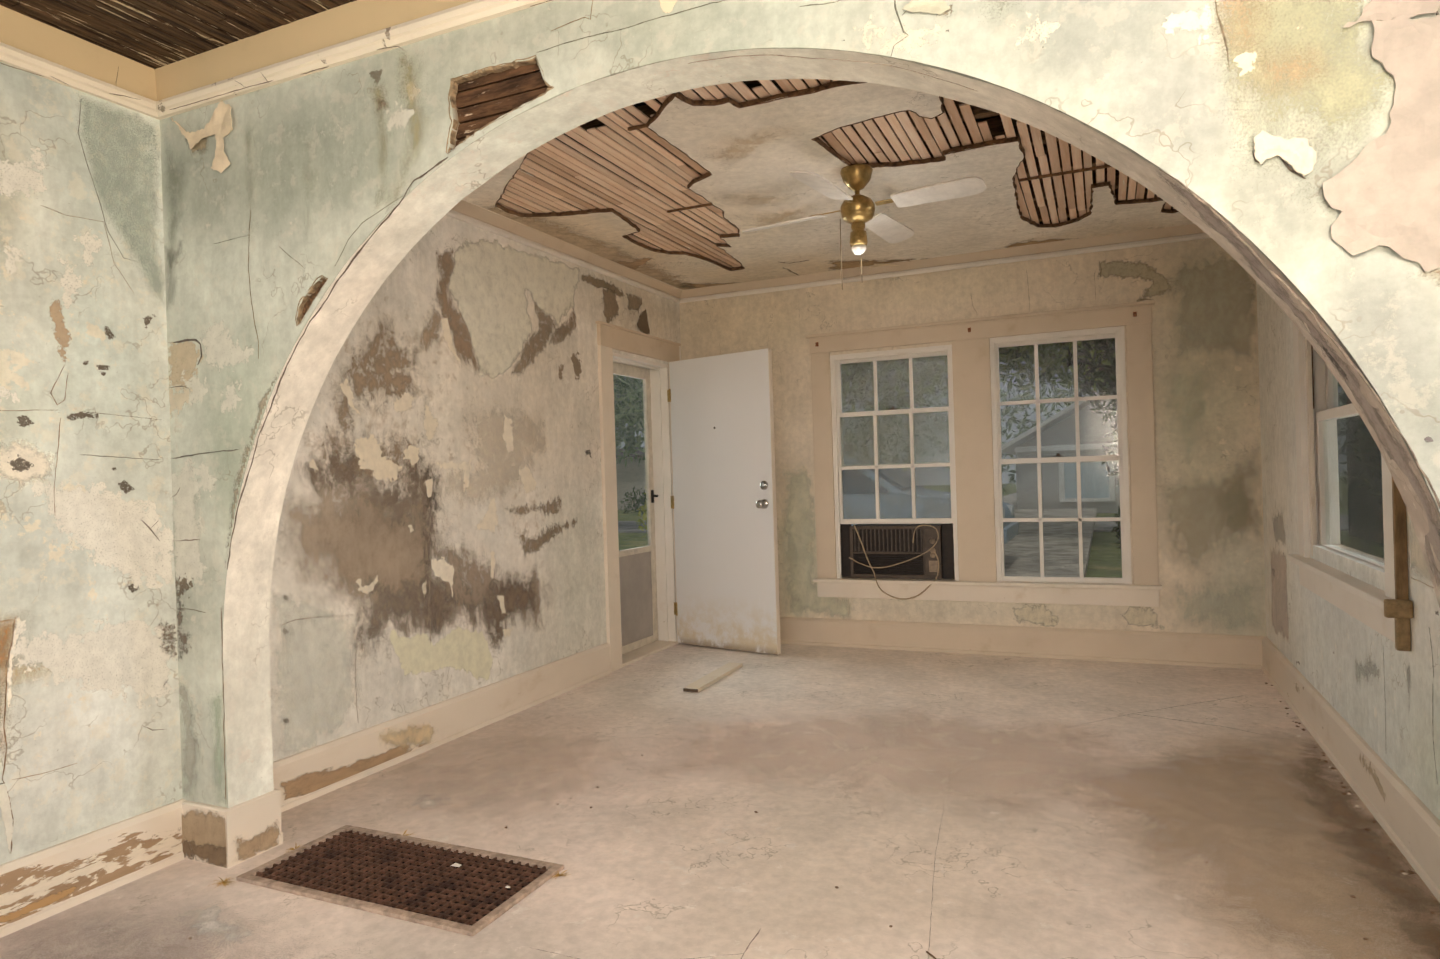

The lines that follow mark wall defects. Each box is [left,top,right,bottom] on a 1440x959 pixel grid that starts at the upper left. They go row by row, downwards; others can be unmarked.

peeling [171,101,233,173]
spalling [446,55,554,154]
peeling [659,0,677,14]
spalling [495,80,866,271]
peeling [1233,51,1257,77]
peeling [1253,0,1440,272]
flaking render [811,96,1440,583]
damp [1174,259,1255,354]
damp [275,249,582,750]
damp [1166,463,1288,636]
crack [0,615,77,854]
peeling [0,828,183,927]